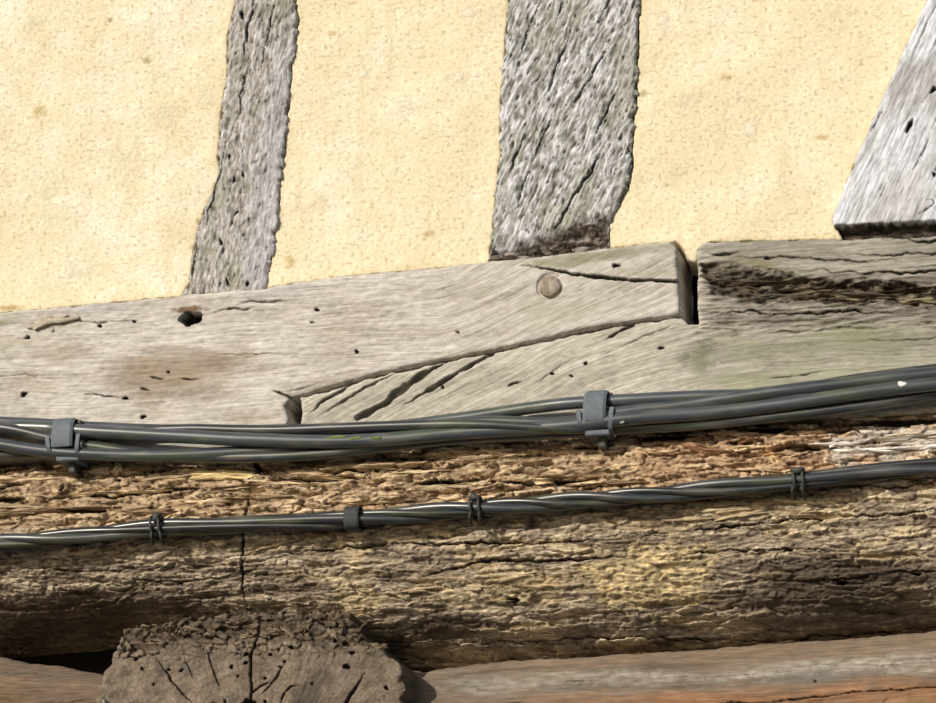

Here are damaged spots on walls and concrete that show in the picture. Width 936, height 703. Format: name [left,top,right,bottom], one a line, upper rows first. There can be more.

crack [772,238,936,275]
crack [534,267,678,284]
crack [274,362,480,419]
crack [48,470,206,502]
crack [423,480,627,490]
crack [97,564,220,583]
crack [242,502,936,609]
crack [251,645,298,703]